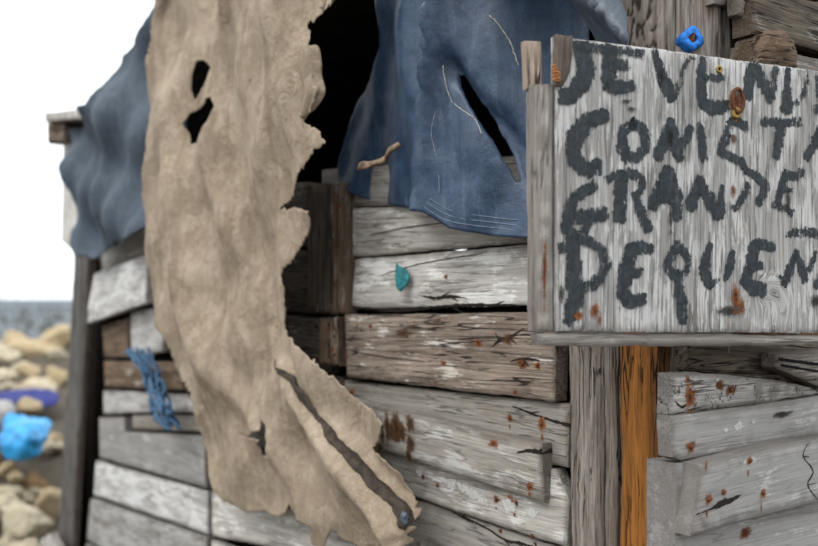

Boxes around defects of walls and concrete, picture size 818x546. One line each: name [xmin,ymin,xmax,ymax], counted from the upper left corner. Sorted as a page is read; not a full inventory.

rust [685,375,696,413]
crack [803,444,818,500]